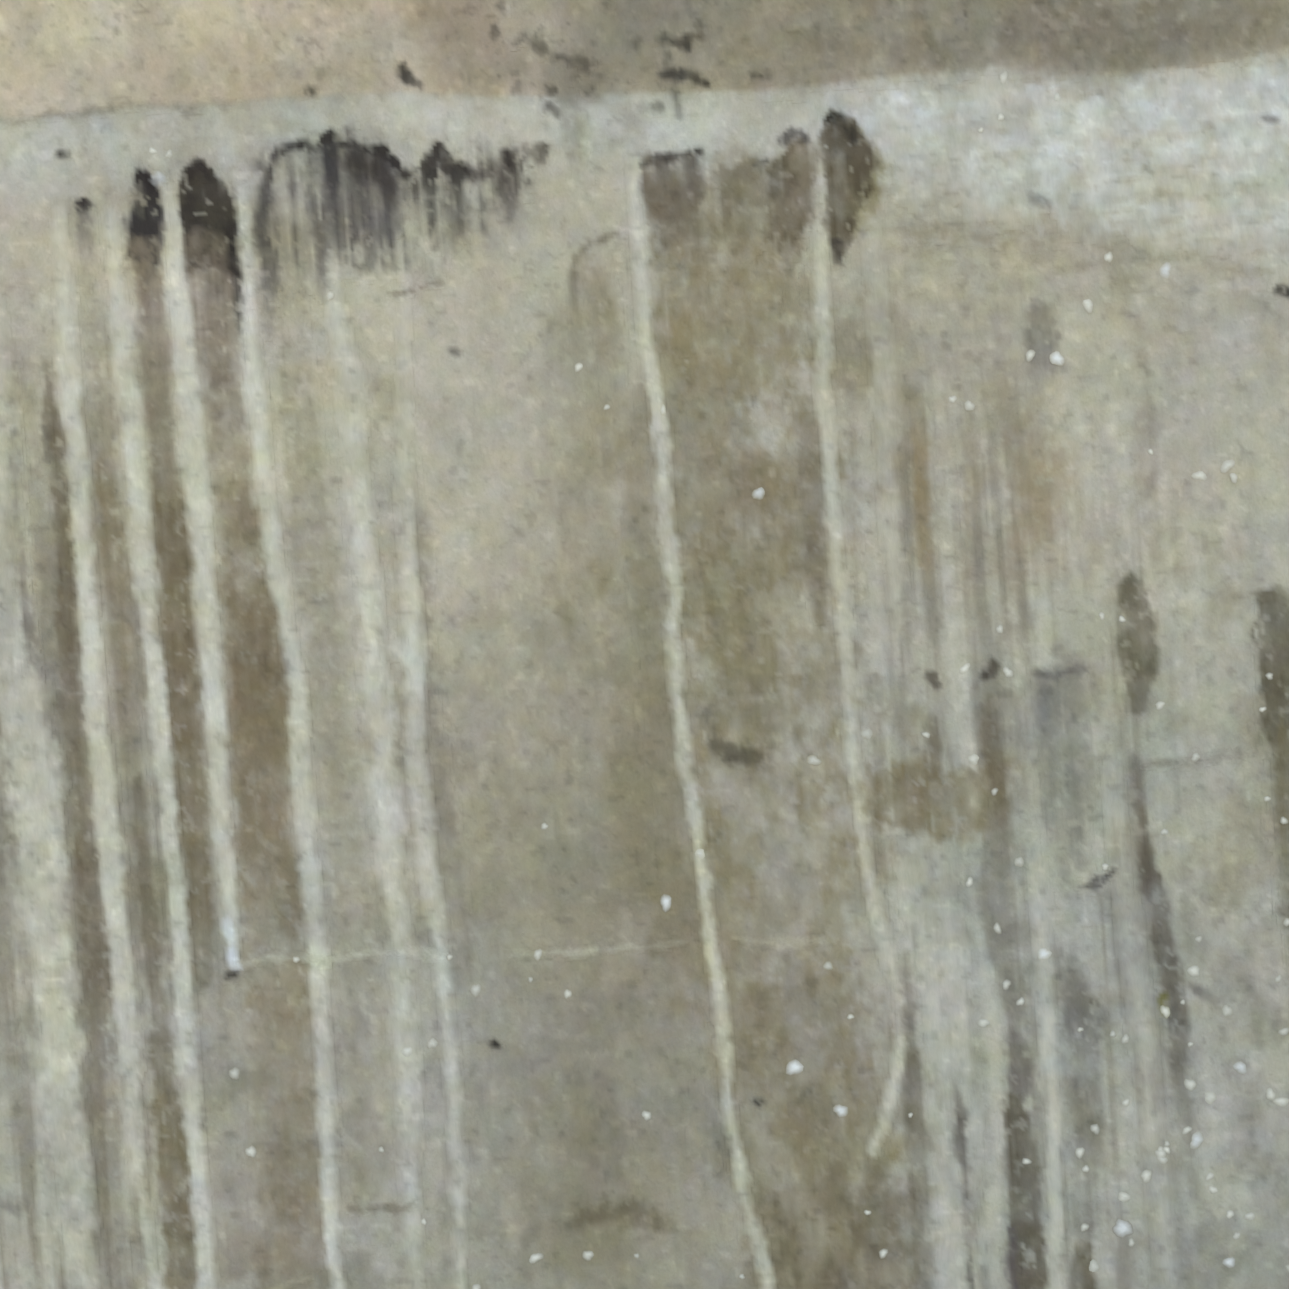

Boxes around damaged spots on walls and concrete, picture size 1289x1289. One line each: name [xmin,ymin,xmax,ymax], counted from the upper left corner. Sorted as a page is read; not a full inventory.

water stain [0,113,545,1289]
water stain [553,104,1229,1289]
water stain [1246,578,1289,968]